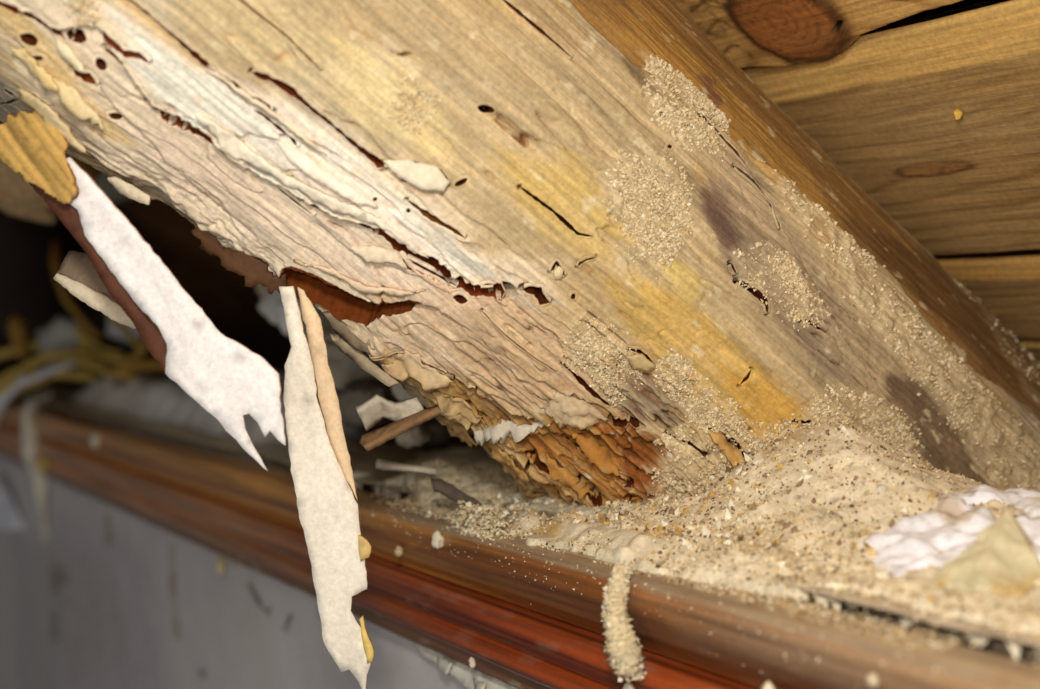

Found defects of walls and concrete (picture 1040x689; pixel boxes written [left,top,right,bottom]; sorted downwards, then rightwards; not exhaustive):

peeling [51,33,89,73]
peeling [7,45,106,156]
peeling [195,66,429,269]
peeling [383,159,450,194]
crack [0,0,656,431]
peeling [293,259,426,297]
peeling [553,266,564,279]
peeling [381,349,620,500]
crack [666,424,749,458]